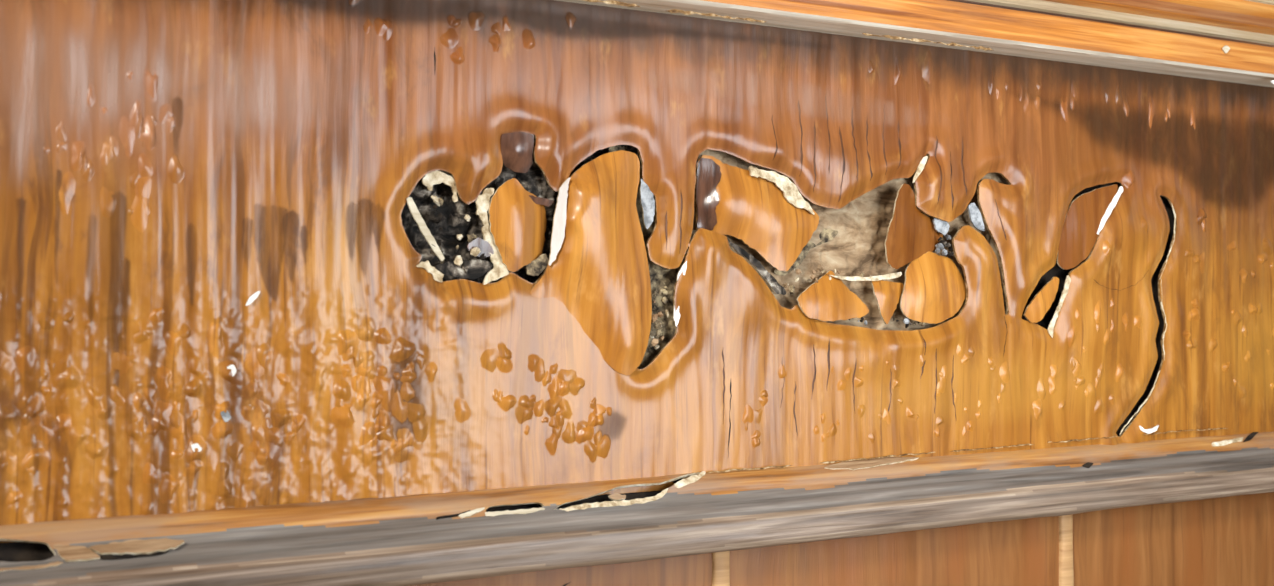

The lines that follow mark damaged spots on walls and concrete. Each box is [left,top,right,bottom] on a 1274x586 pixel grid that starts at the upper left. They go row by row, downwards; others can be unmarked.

spalling [401,136,559,283]
peeling [569,145,1009,369]
peeling [1022,182,1121,329]
crack [1116,196,1176,437]